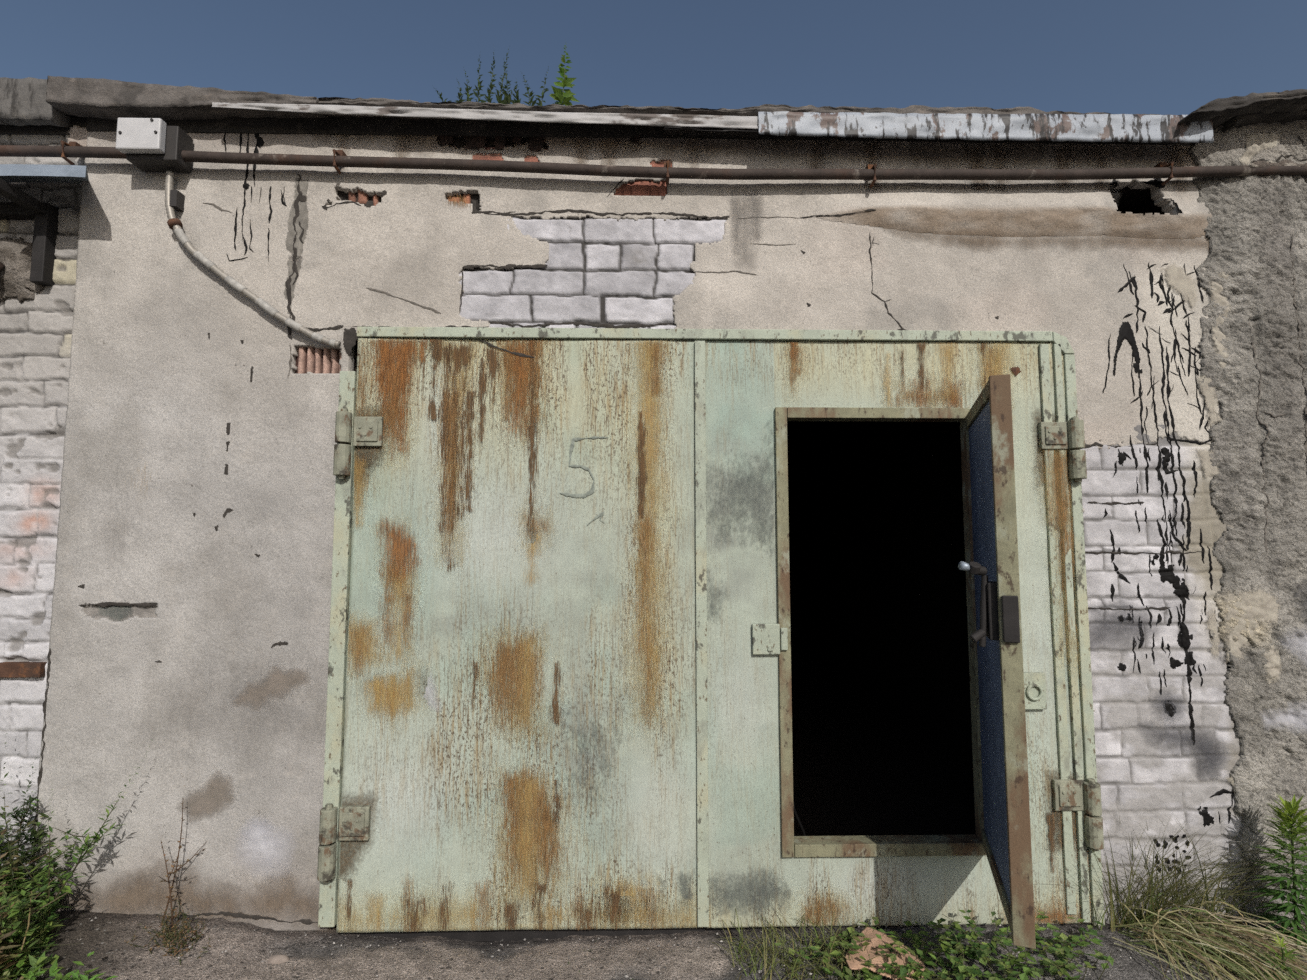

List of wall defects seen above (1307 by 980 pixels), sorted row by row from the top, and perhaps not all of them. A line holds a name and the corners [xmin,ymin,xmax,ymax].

spalling [322,190,387,210]
crack [283,174,471,339]
spalling [447,160,730,329]
crack [869,234,906,330]
spalling [1108,178,1165,215]
corrosion [359,339,544,572]
corrosion [635,343,664,683]
water stain [1103,263,1219,744]
spalling [78,584,158,621]
corrosion [471,638,560,726]
spalling [1080,425,1282,924]
corrosion [499,772,561,930]